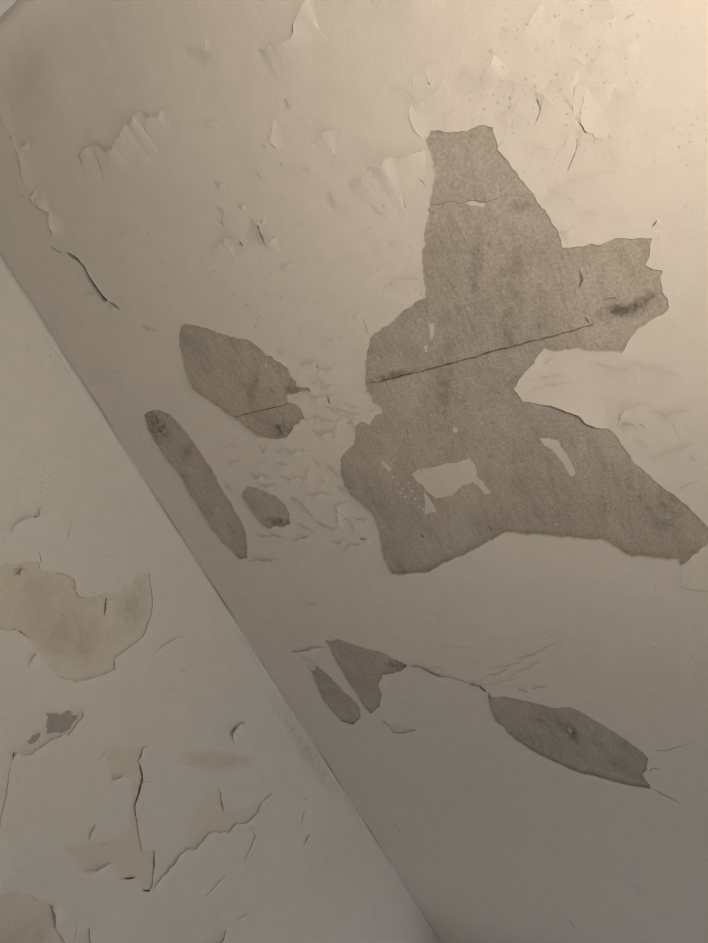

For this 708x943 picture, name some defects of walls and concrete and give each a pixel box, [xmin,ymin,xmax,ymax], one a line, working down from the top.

peeling [171,317,320,449]
peeling [330,110,708,586]
peeling [139,405,295,565]
peeling [12,705,88,762]
peeling [0,552,157,692]
peeling [299,635,418,735]
peeling [481,688,658,794]
peeling [65,742,159,898]
peeling [181,784,273,863]
peeling [0,887,97,943]